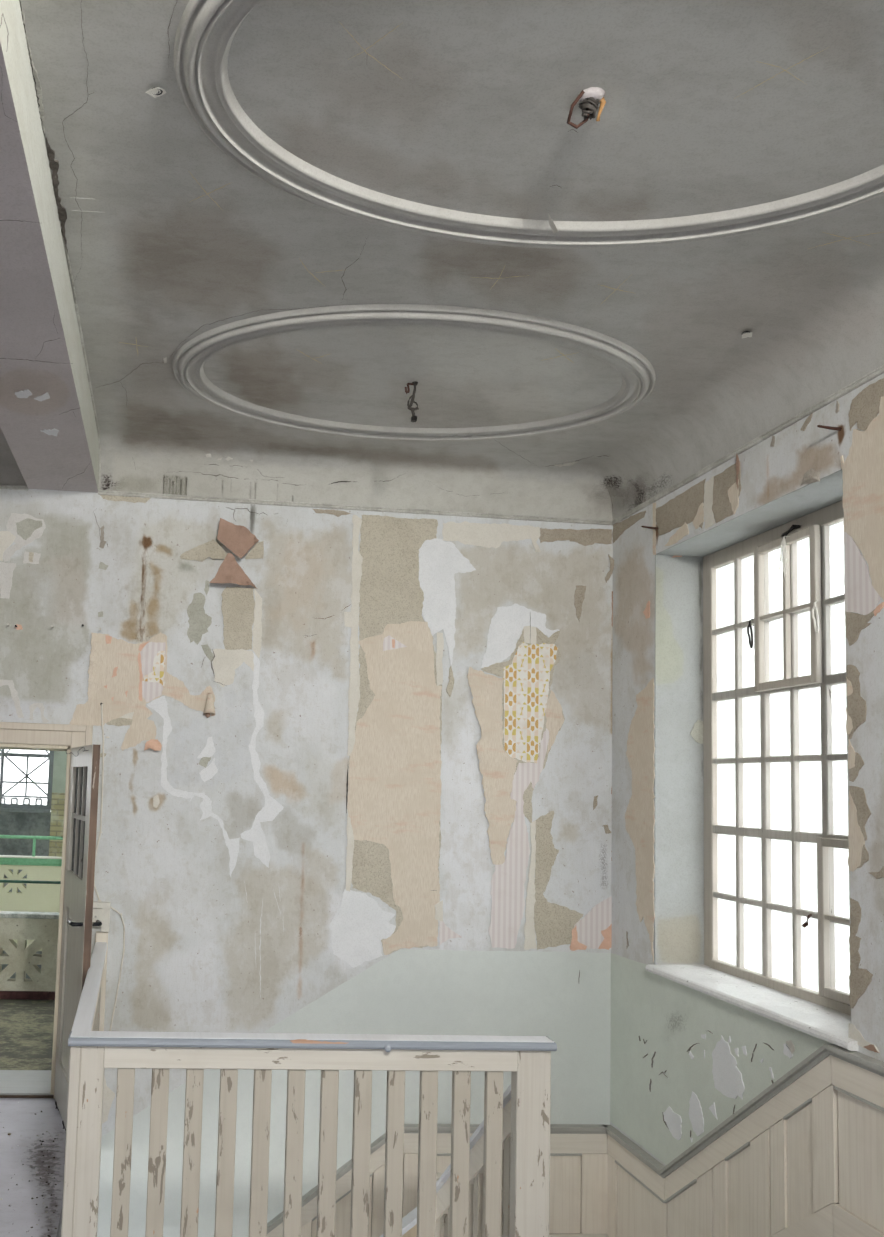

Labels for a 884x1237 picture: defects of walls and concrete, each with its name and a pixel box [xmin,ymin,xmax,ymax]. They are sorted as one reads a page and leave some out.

crack [0,0,93,280]
flaking render [835,378,884,431]
flaking render [539,463,741,546]
flaking render [147,649,284,876]
flaking render [313,509,476,755]
flaking render [481,603,565,774]
flaking render [845,609,875,646]
flaking render [846,665,884,879]
flaking render [329,840,403,968]
flaking render [523,782,583,950]
flaking render [849,898,873,1008]
peeling [663,1034,747,1142]